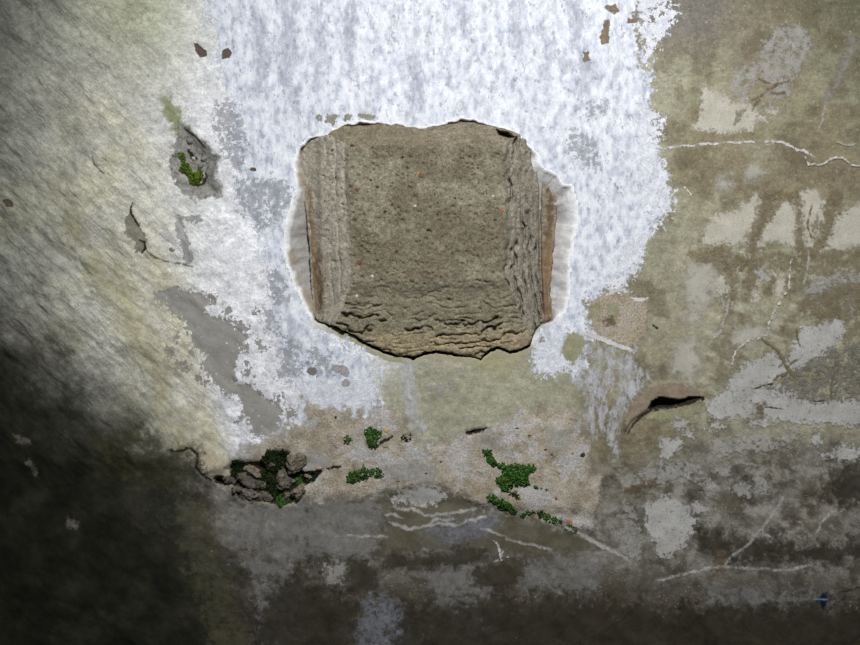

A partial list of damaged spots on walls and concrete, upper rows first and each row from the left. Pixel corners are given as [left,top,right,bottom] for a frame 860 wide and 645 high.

crack [656,140,860,167]
leakage [202,0,682,461]
peeling [151,99,604,531]
crack [170,447,212,480]
crack [347,507,550,562]
leakage [225,491,860,645]
crack [565,526,629,561]